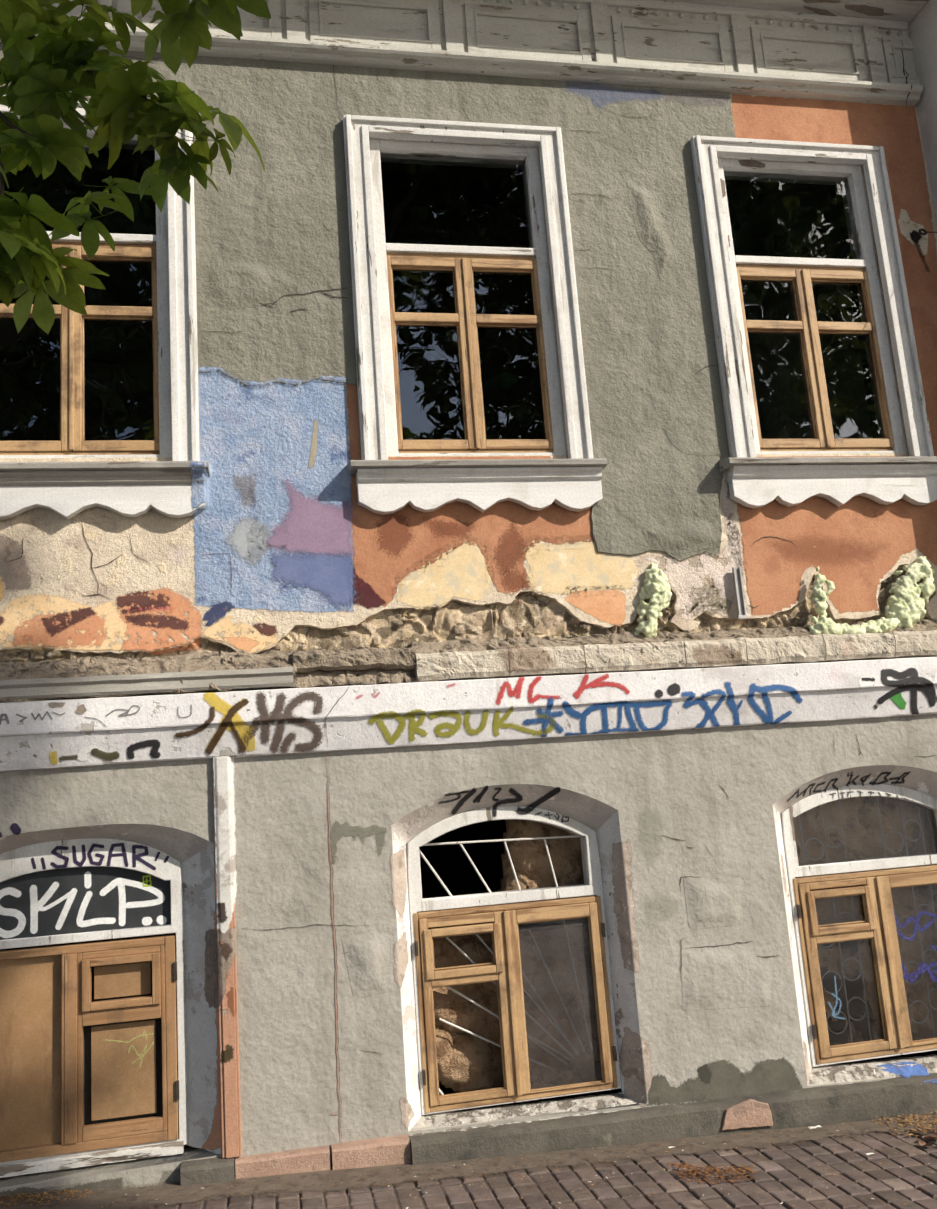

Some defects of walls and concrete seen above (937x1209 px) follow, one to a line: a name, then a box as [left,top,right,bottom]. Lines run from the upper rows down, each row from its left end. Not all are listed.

peeling [803,0,884,16]
flaking render [898,208,930,272]
crack [259,287,351,312]
crack [81,522,153,599]
peeling [396,540,493,610]
peeling [522,471,751,627]
peeling [203,616,278,653]
peeling [390,849,407,917]
peeling [612,840,641,973]
peeling [201,756,238,1150]
peeling [619,1027,652,1107]
water stain [646,1058,804,1106]